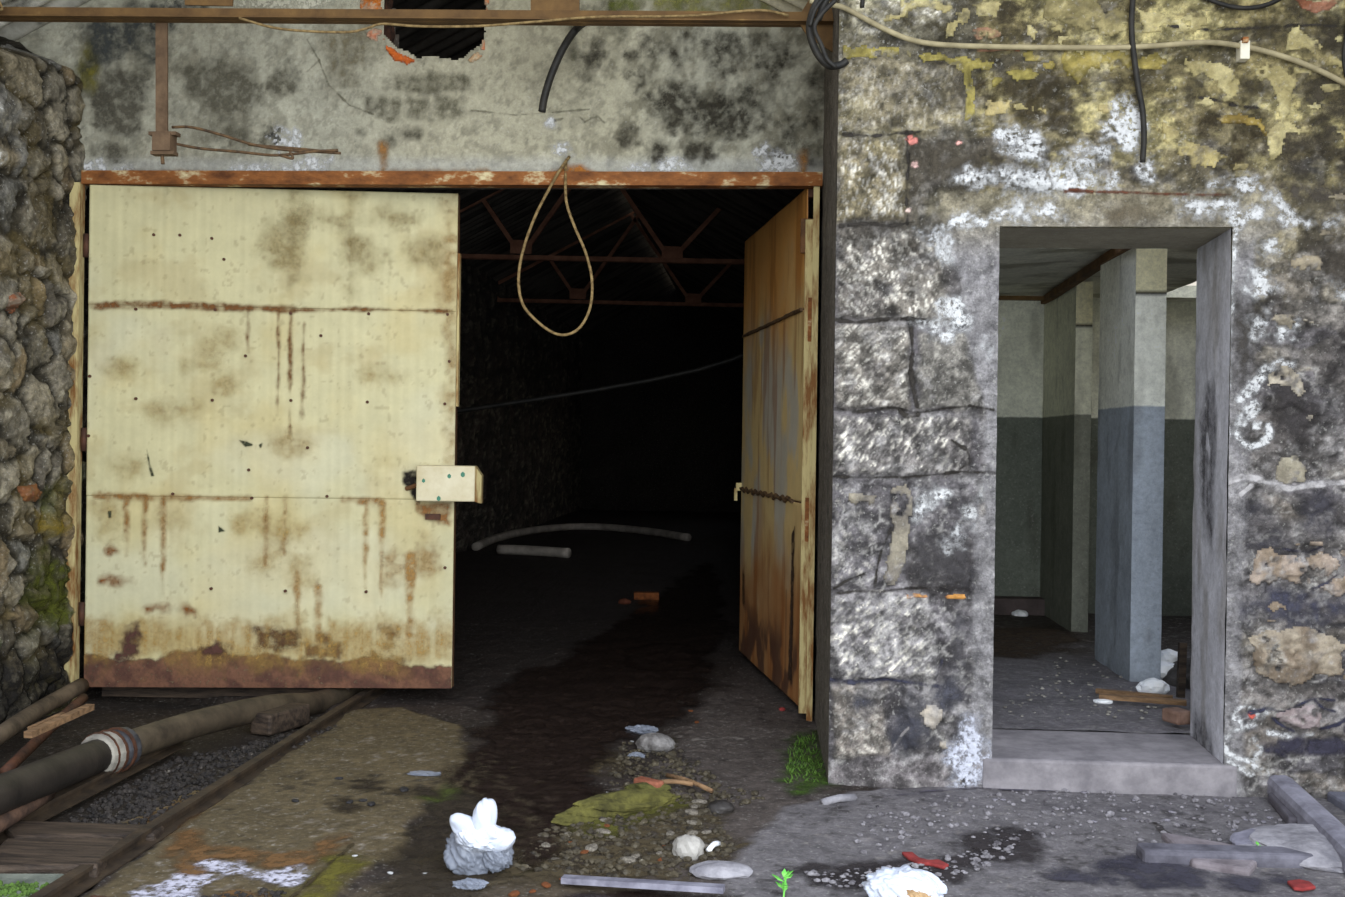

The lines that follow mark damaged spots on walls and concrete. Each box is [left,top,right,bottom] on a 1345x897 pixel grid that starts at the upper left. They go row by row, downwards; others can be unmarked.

damp [83,0,204,170]
damp [185,61,333,171]
rust [378,142,387,171]
spalling [367,25,414,65]
damp [618,76,812,172]
damp [851,74,1155,262]
peeling [843,0,1225,121]
peeling [1151,122,1248,171]
peeling [1184,25,1344,160]
damp [1184,75,1345,538]
spalling [1249,541,1345,597]
spalling [1248,601,1345,688]